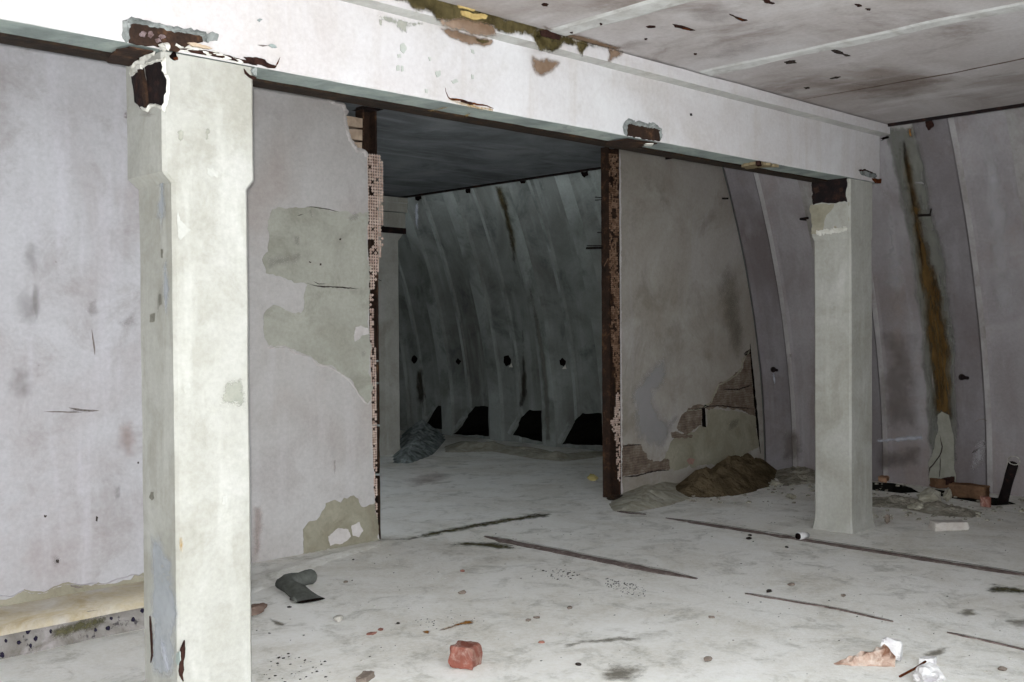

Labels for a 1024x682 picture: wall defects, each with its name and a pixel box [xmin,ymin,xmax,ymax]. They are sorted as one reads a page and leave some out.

spalling [106,16,243,112]
spalling [605,118,663,148]
spalling [816,226,847,236]
peeling [262,206,373,405]
corrosion [904,143,951,416]
flaking render [621,349,759,477]
peeling [303,495,379,554]
leakage [53,618,106,637]